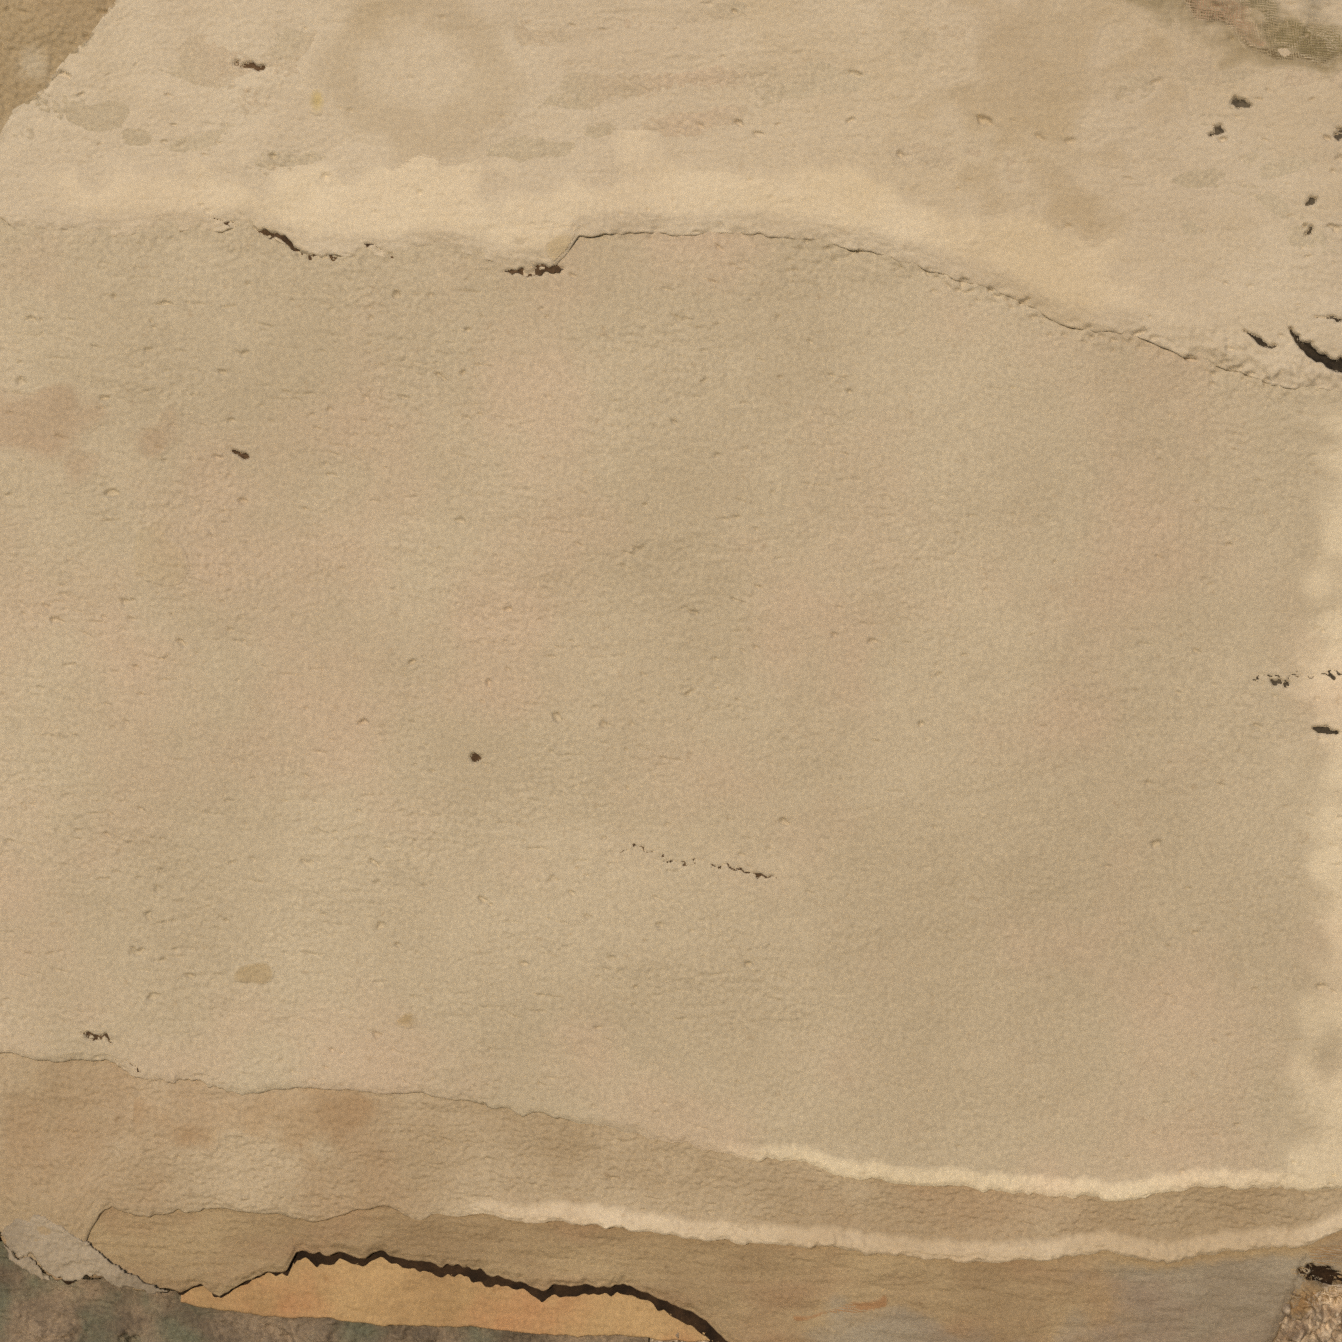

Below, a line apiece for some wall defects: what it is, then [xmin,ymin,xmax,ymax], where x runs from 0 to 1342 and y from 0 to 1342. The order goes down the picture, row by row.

crack [214,218,394,261]
crack [505,264,561,277]
crack [1244,316,1342,372]
peeling [1,1214,168,1295]
crack [160,1251,727,1342]
spalling [1275,1271,1342,1342]